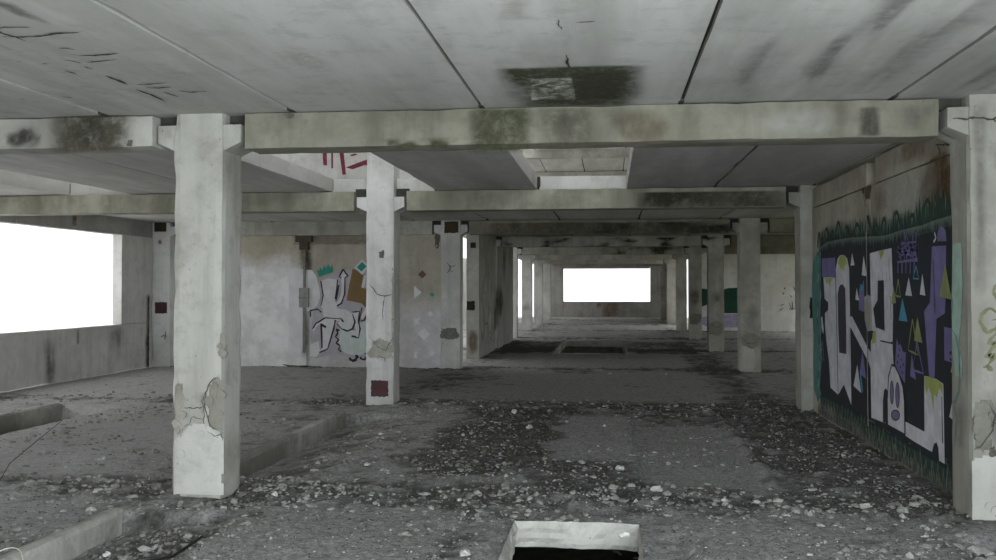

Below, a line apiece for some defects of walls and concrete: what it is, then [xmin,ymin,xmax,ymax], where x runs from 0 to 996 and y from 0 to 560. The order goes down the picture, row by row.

damp [59,115,124,152]
damp [476,66,636,152]
crack [953,115,996,123]
crack [928,143,950,163]
spalling [367,337,393,362]
peeling [172,376,227,495]
peeling [972,400,996,520]